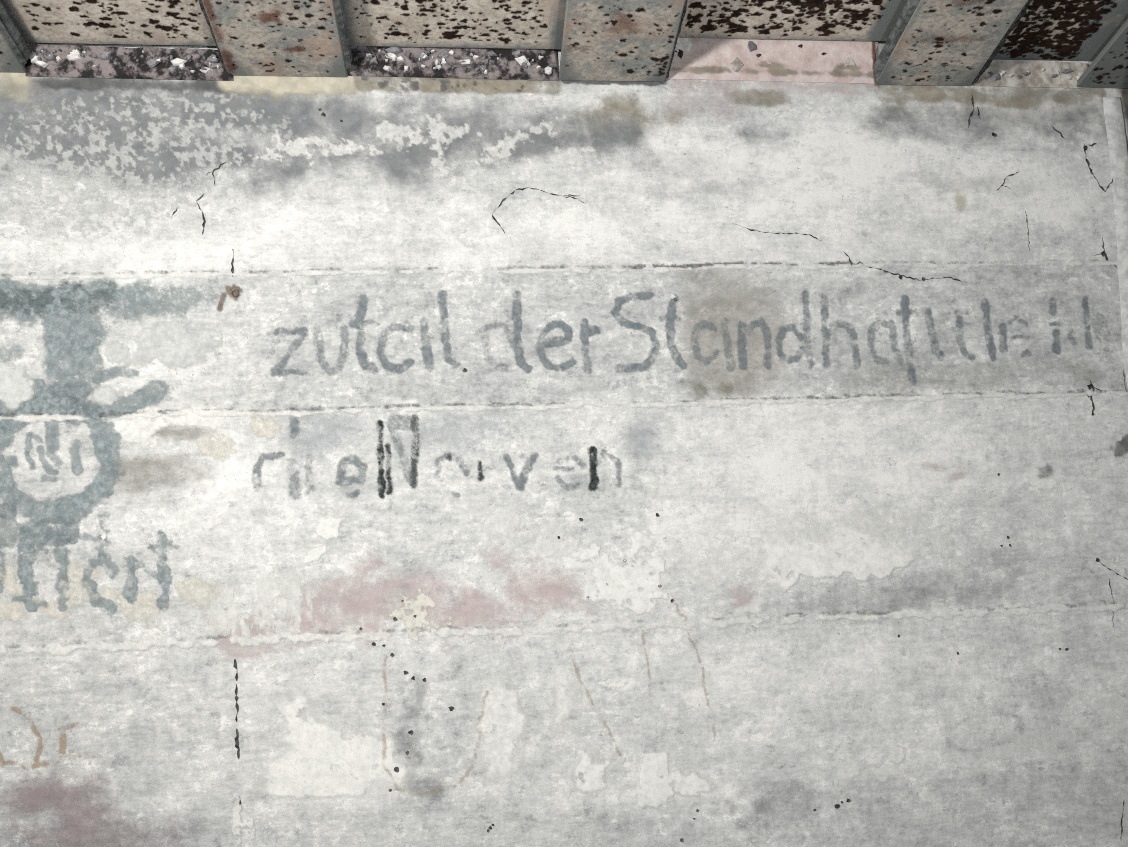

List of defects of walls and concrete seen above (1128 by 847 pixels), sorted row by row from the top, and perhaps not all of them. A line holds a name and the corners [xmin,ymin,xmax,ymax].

leakage [0,72,647,183]
leakage [720,86,783,106]
crack [1052,126,1113,191]
crack [492,187,586,233]